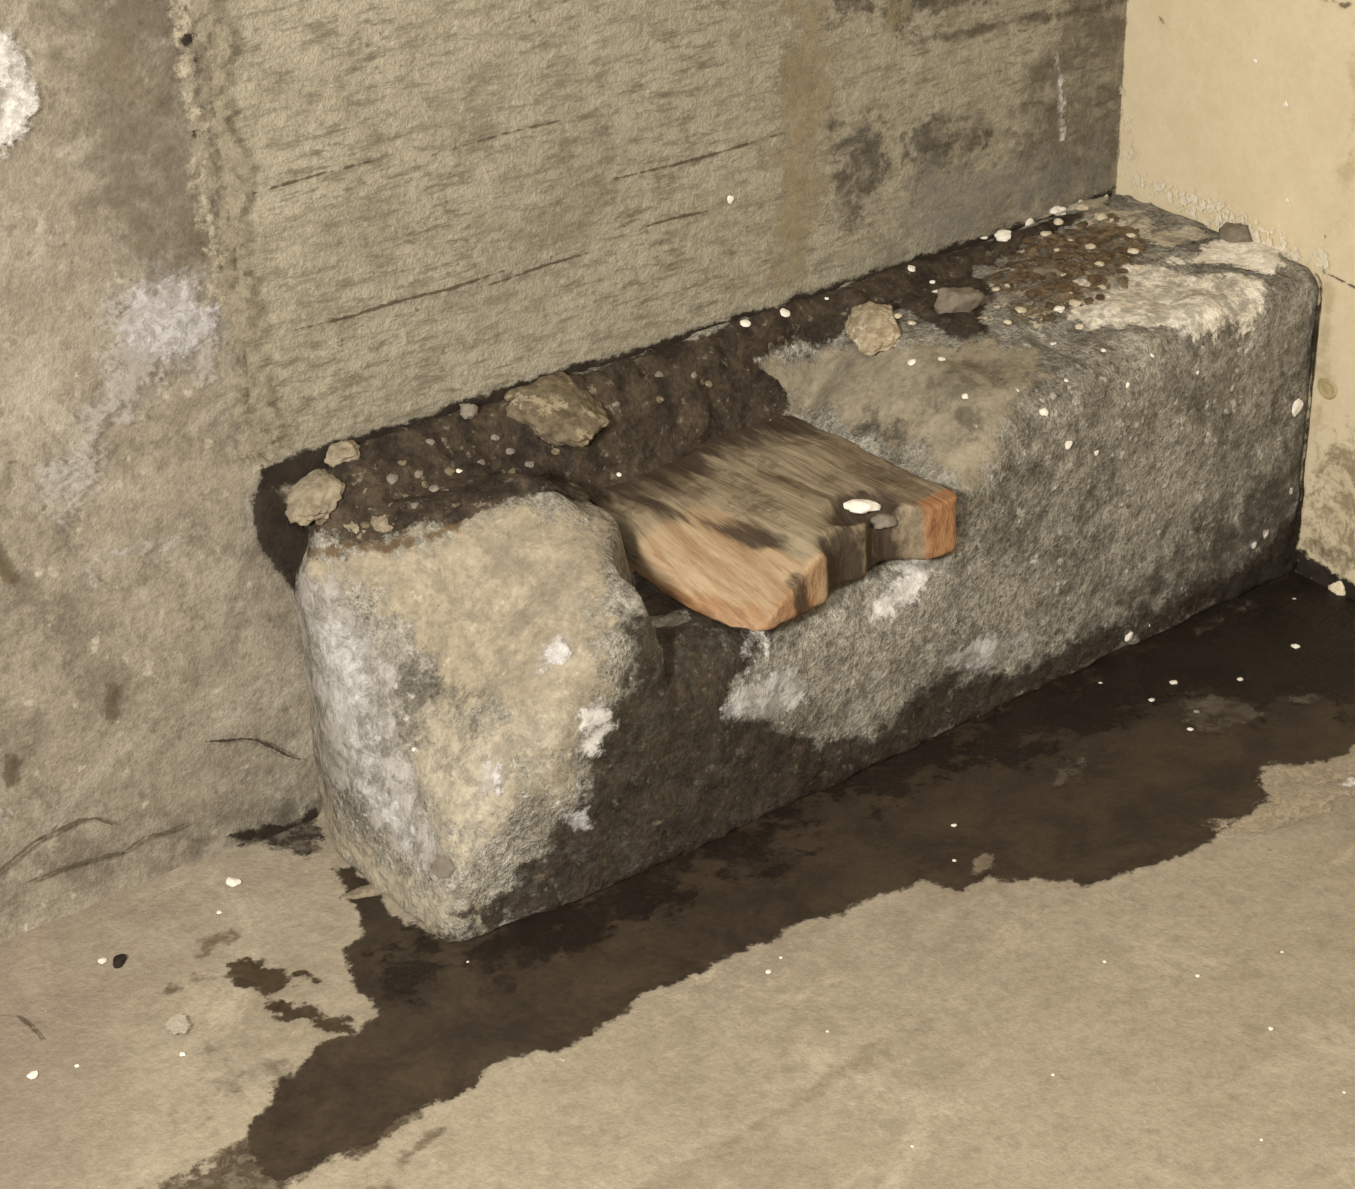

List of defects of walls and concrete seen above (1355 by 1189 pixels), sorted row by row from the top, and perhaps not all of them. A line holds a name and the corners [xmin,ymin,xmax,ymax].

water stain [0,30,39,158]
water stain [159,394,1355,1189]